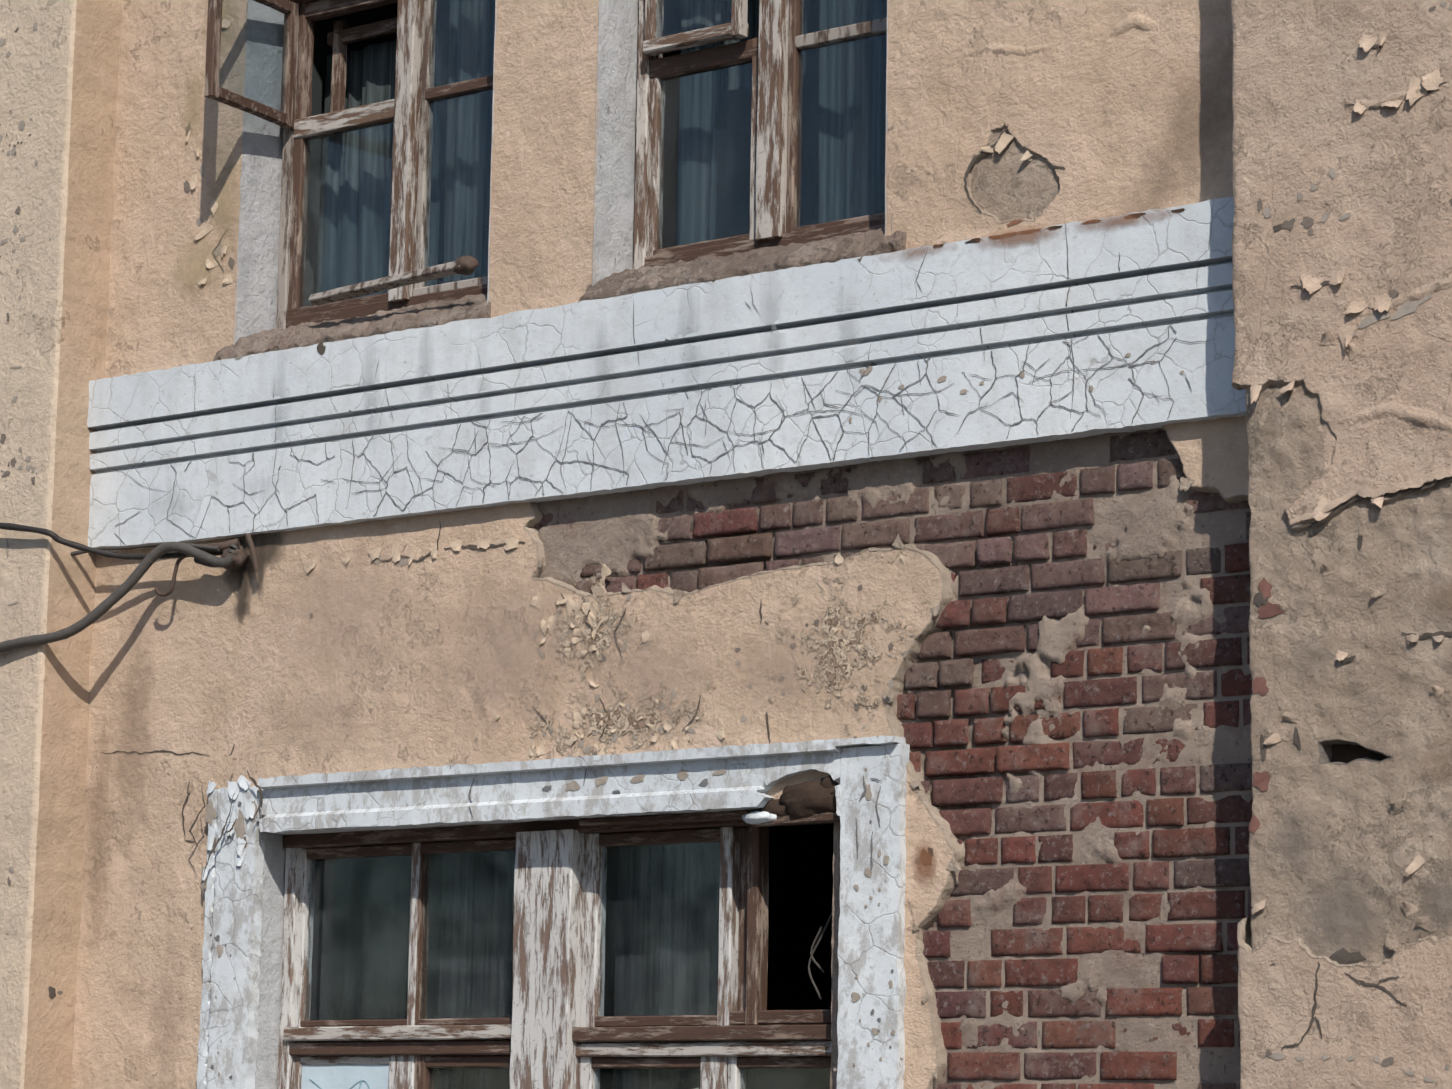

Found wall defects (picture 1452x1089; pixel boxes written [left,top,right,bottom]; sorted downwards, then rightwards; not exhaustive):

peeling [1358,32,1388,52]
peeling [1345,70,1447,114]
flaking render [964,124,1065,227]
crack [114,224,1213,545]
flaking render [340,379,1452,1089]
crack [102,744,262,877]
crack [1281,962,1407,1051]